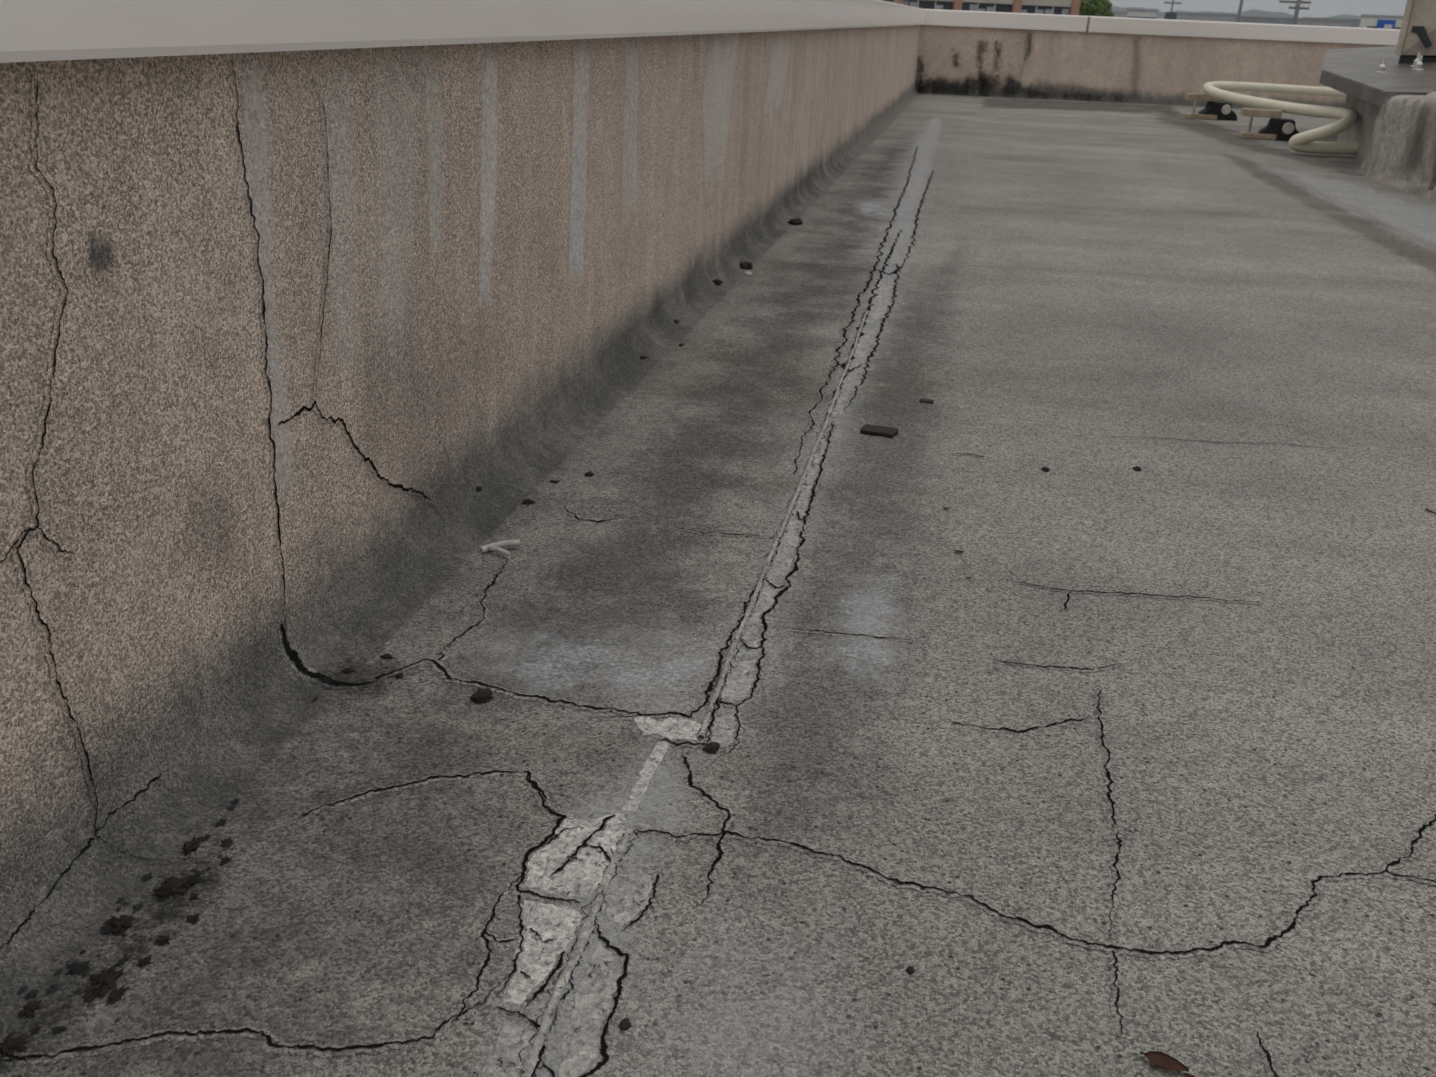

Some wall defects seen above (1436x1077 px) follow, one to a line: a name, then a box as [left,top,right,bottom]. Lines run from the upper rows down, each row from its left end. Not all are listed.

damp [916,42,1047,98]
crack [0,64,211,954]
crack [228,59,1436,1038]
spalling [501,438,827,1005]
crack [0,769,665,1077]
spalling [481,1020,534,1077]
spalling [558,943,622,1077]
crack [1251,1031,1282,1077]